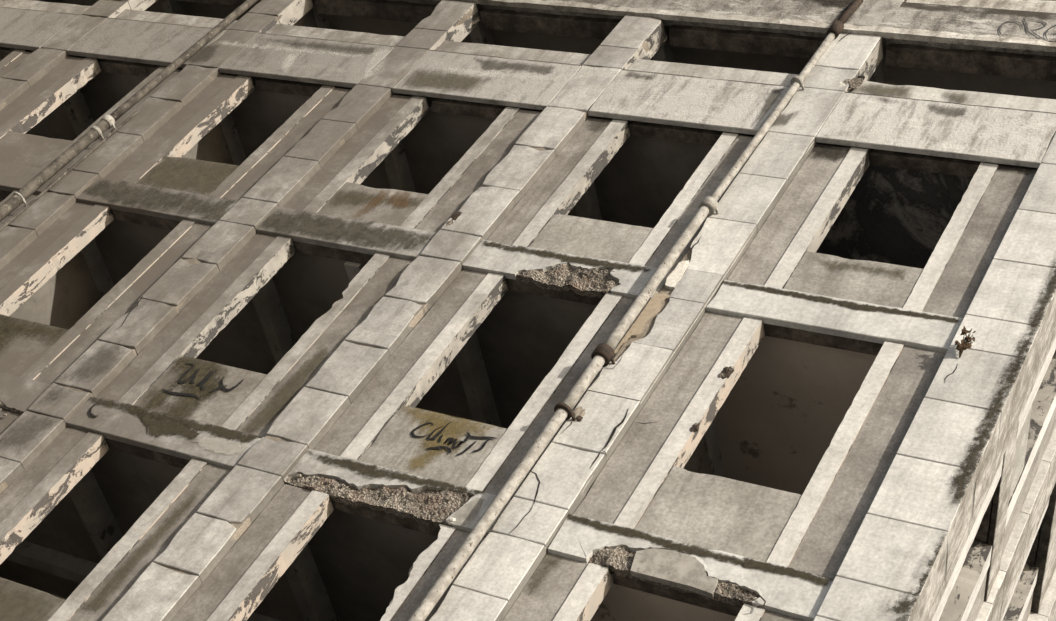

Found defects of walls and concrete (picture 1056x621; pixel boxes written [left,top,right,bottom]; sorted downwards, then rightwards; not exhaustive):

water stain [931,94,966,116]
water stain [335,192,419,206]
spalling [513,263,619,298]
water stain [0,314,69,351]
water stain [952,266,1056,504]
crack [590,408,658,468]
spalling [285,474,485,528]
spalling [588,546,759,607]